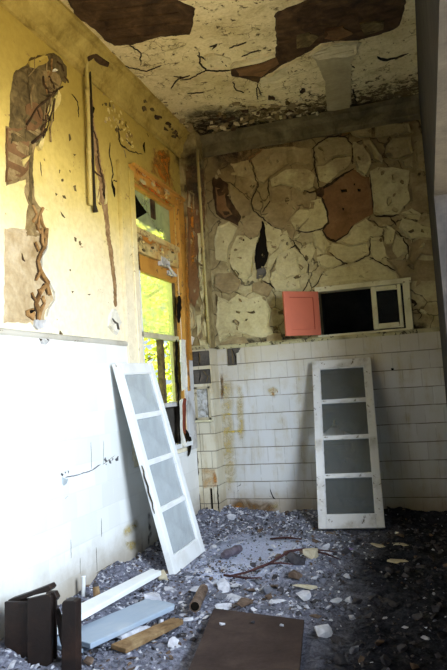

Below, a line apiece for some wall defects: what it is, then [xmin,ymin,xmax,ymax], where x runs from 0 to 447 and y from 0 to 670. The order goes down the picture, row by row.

flaking render [68,0,195,46]
crack [125,45,161,72]
crack [171,42,261,99]
flaking render [204,0,406,88]
crack [377,53,409,61]
peeling [142,88,319,141]
flaking render [3,53,69,330]
crack [304,135,362,193]
crack [231,158,409,291]
peeling [137,123,435,456]
crack [61,449,119,499]